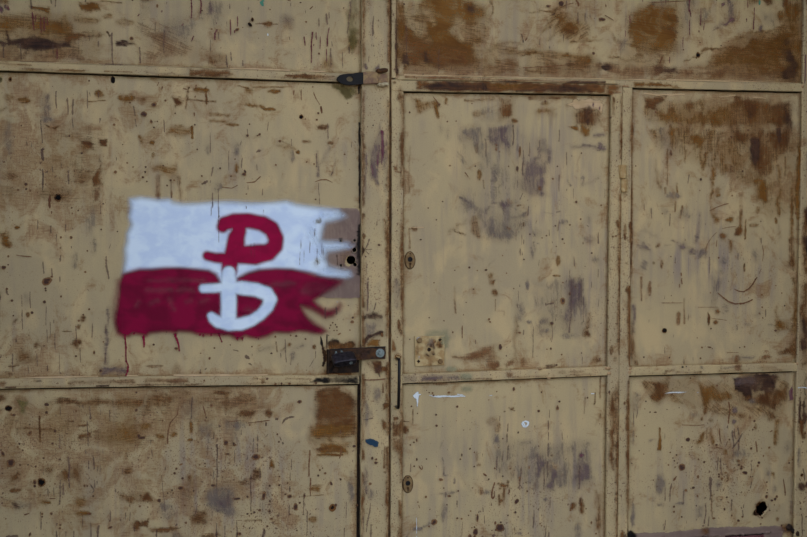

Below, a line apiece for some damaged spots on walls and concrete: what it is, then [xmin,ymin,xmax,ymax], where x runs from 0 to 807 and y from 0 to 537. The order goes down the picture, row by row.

corrosion [571,108,598,136]
corrosion [456,344,524,377]
corrosion [310,382,357,456]
corrosion [745,377,787,467]